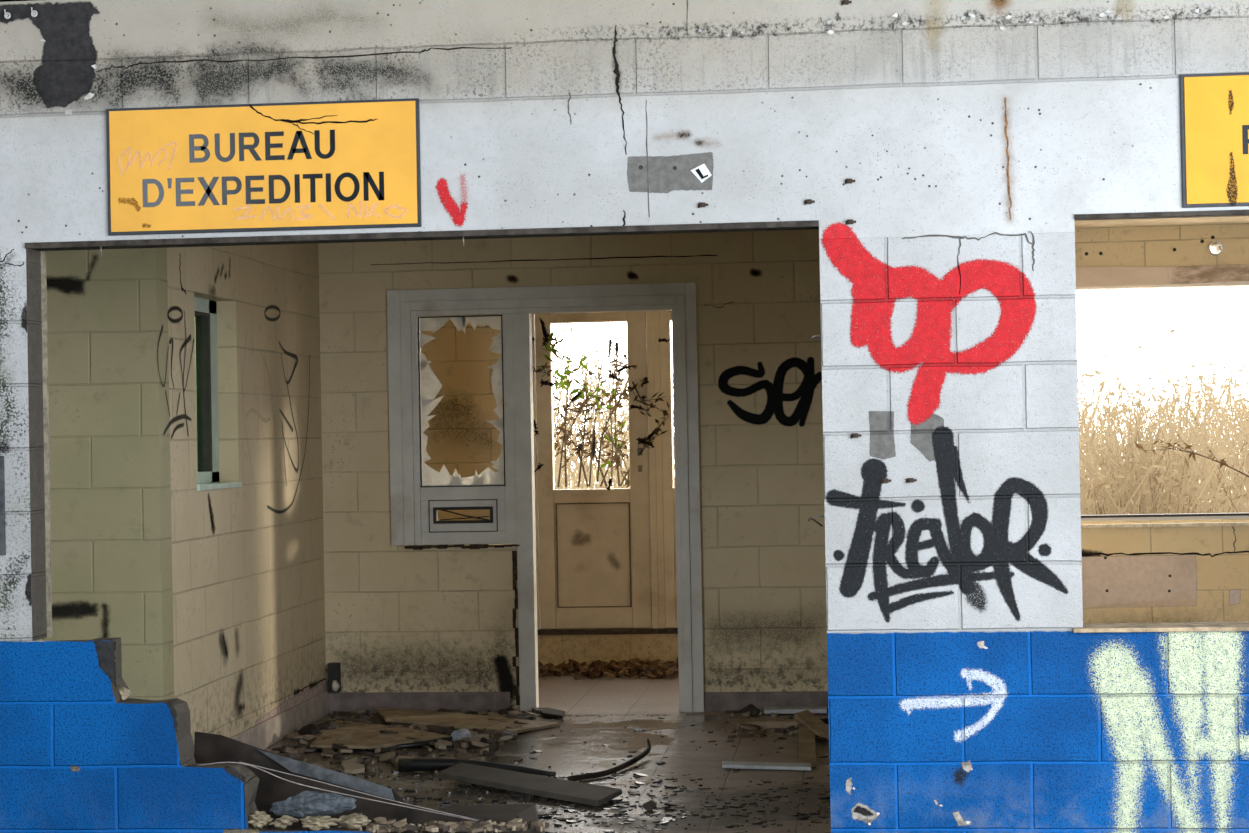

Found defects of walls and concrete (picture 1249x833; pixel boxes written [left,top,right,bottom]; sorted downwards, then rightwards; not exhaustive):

peeling [0,2,111,115]
leakage [111,43,307,106]
leakage [316,56,429,99]
crack [612,25,650,226]
crack [371,255,718,265]
crack [1081,527,1249,557]
leakage [494,656,514,704]
spalling [954,761,973,784]
spalling [846,778,880,825]
spalling [934,800,971,826]